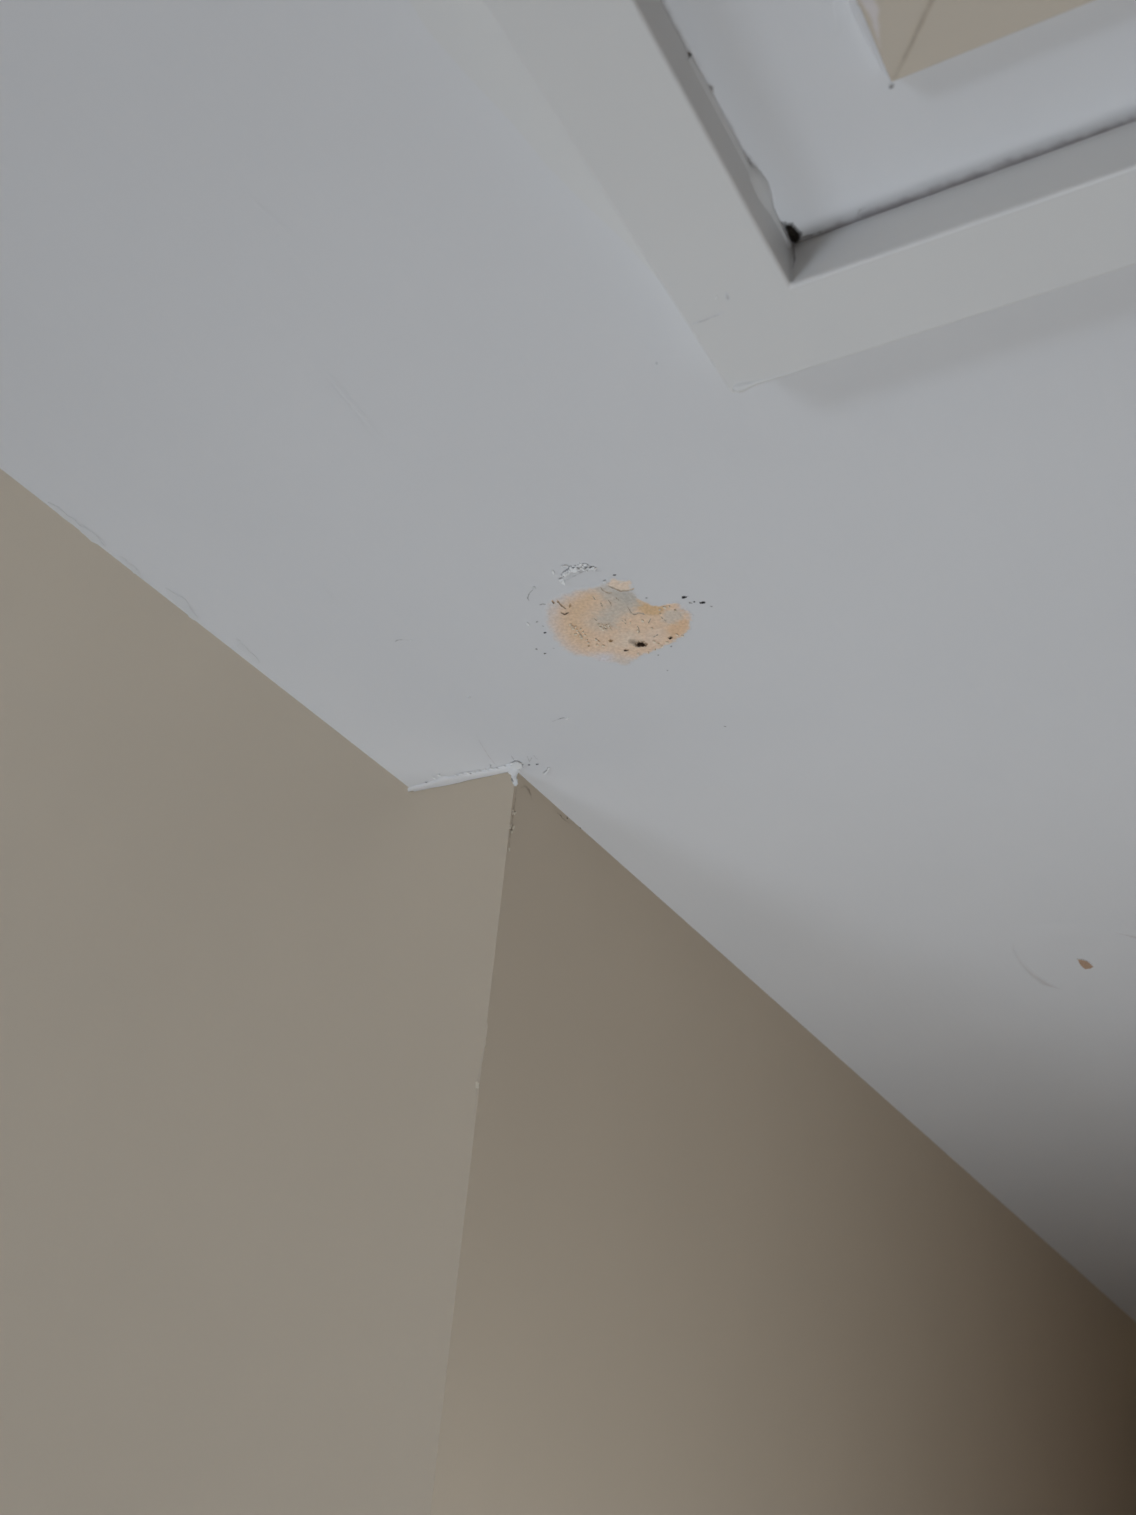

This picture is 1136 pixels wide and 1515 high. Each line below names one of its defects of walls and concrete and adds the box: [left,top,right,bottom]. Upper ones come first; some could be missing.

flaking render [526,563,713,671]